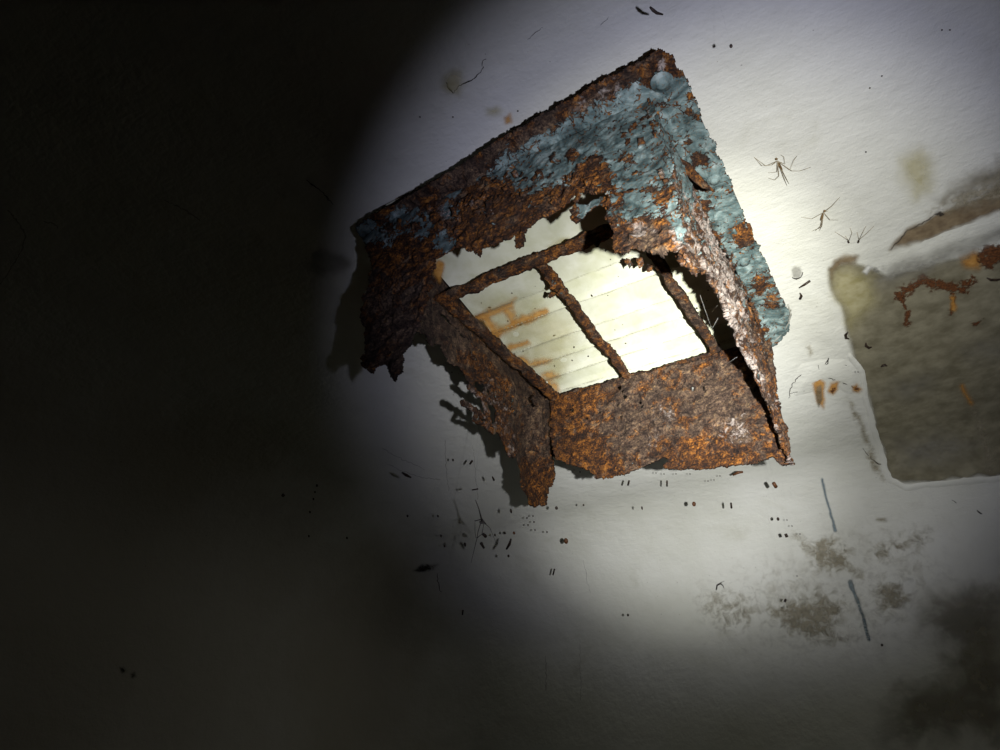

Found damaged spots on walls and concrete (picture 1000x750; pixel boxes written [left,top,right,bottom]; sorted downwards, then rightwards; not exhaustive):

corrosion [620,115,648,150]
corrosion [439,151,646,228]
corrosion [434,261,444,281]
corrosion [544,274,571,303]
corrosion [624,257,654,272]
corrosion [894,245,1000,327]
corrosion [475,302,548,337]
corrosion [508,341,558,392]
spalling [830,254,1000,491]
water stain [812,540,845,567]
water stain [775,599,839,636]